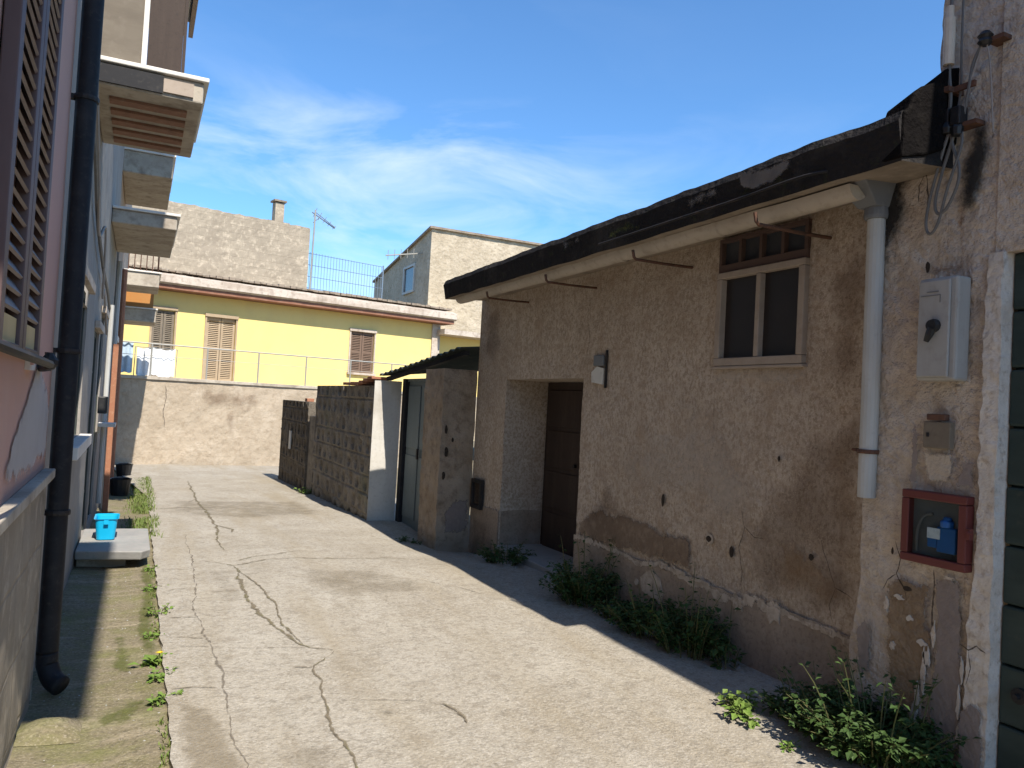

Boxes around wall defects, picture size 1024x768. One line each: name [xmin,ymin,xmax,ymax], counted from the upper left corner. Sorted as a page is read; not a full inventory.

peeling [738,160,789,188]
water stain [961,127,987,208]
crack [171,485,431,768]
flaking render [574,534,850,650]
flaking render [883,579,936,719]